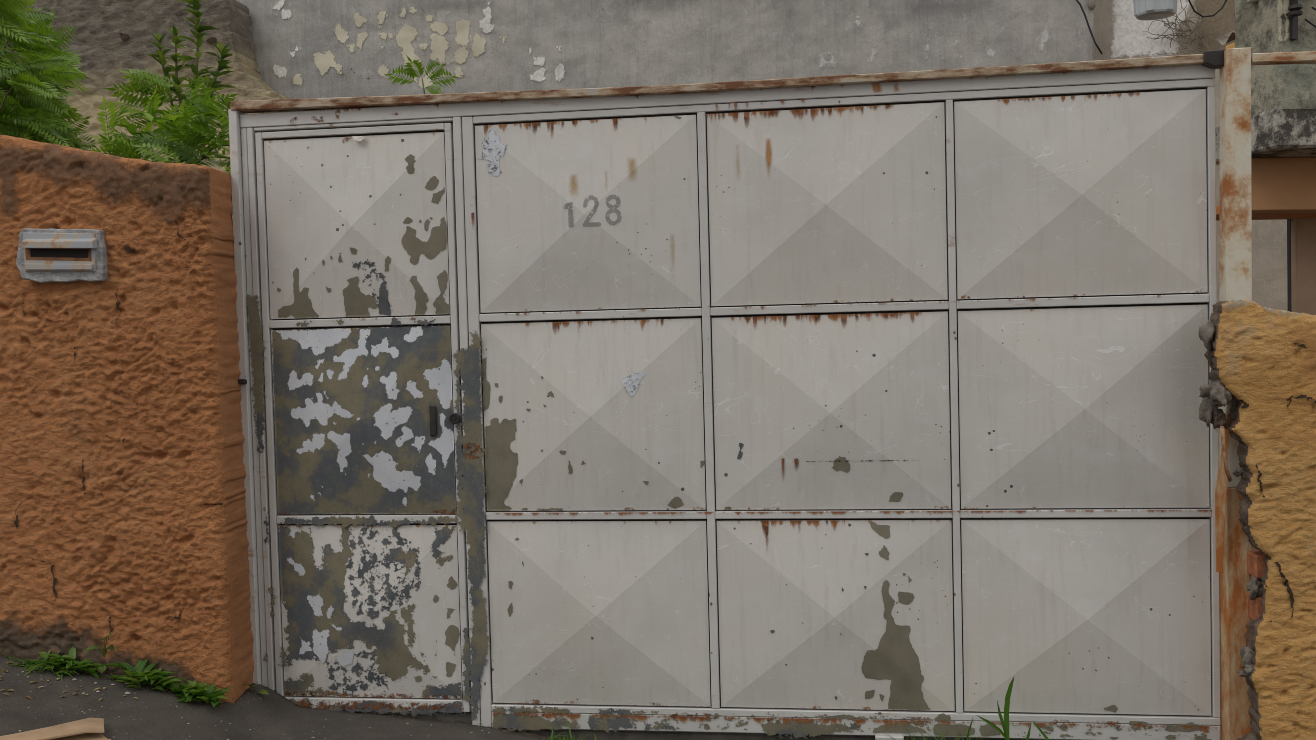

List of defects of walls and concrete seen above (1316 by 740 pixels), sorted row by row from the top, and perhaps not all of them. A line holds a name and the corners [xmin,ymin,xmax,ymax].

peeling [273,0,507,89]
peeling [529,46,565,82]
rust [484,118,621,133]
peeling [405,154,415,174]
damp [0,145,211,222]
crack [1287,395,1316,407]
peeling [246,176,1211,740]
rust [604,506,1212,540]
damp [0,619,194,685]
rust [493,700,964,726]
rust [992,720,1166,728]